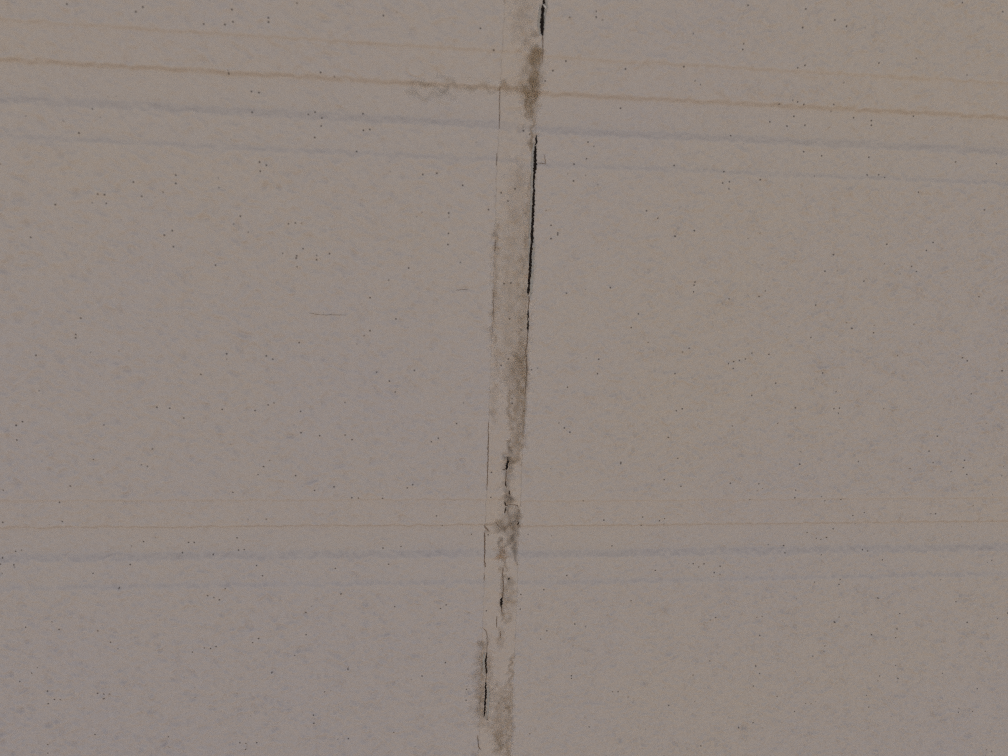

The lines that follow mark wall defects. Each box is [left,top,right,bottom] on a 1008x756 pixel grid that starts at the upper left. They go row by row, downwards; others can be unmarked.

crack [537,0,548,60]
crack [525,135,546,392]
crack [477,422,519,750]